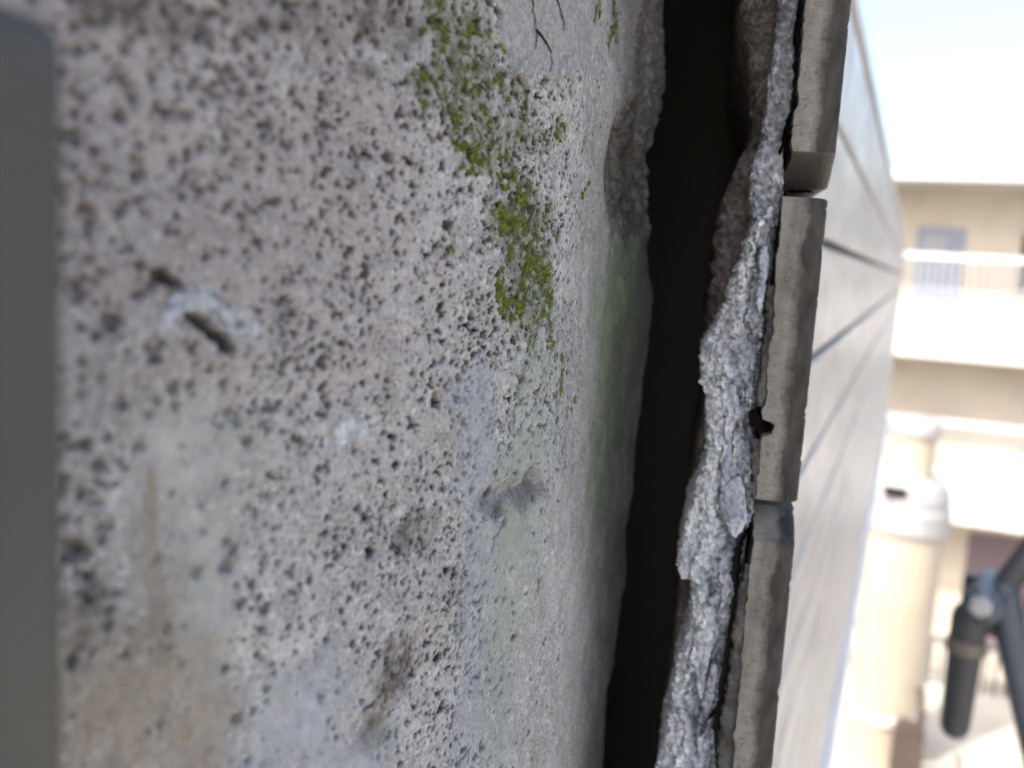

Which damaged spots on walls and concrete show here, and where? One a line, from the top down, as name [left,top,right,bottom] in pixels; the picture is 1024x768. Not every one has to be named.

crack [532,0,565,70]
spalling [654,206,777,768]
crack [700,522,750,768]